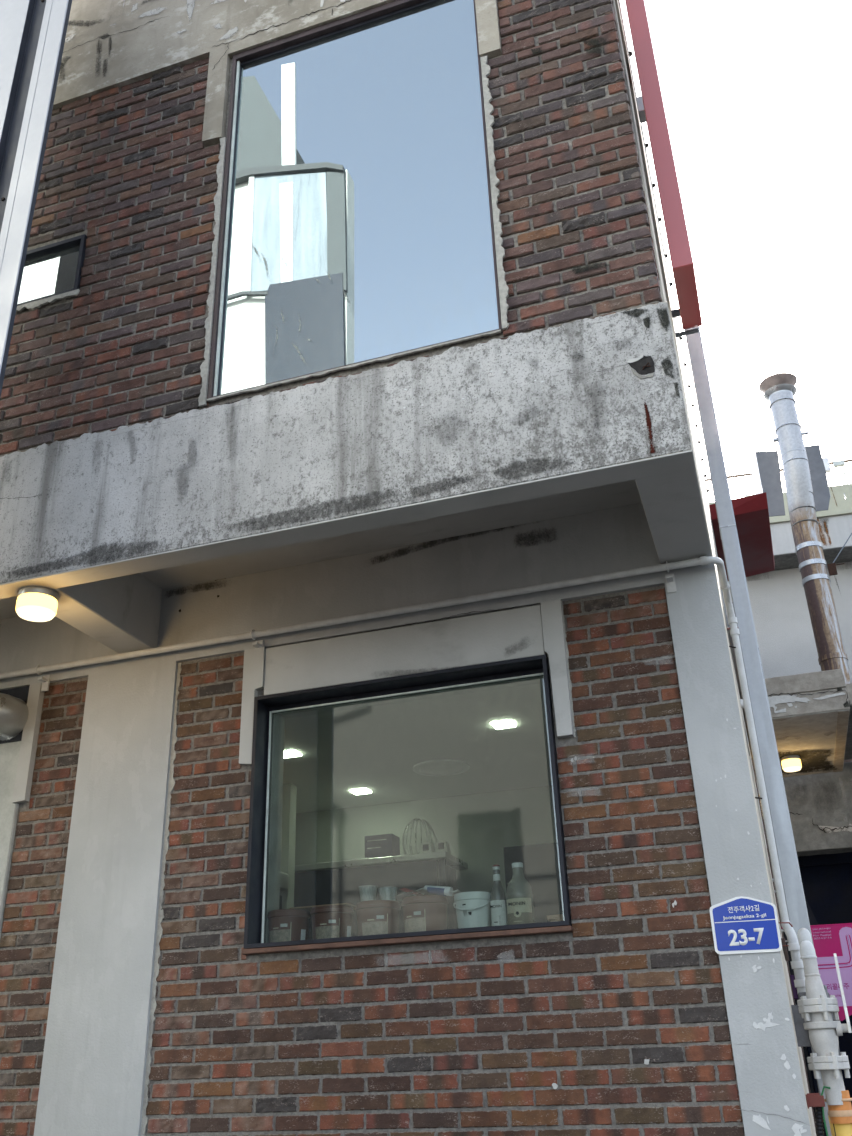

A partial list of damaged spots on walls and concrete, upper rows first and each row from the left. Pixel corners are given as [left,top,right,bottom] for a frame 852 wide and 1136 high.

crack [213,0,351,69]
spalling [627,355,655,379]
corrosion [644,402,656,453]
water stain [494,458,572,478]
water stain [413,477,472,497]
water stain [232,489,399,531]
water stain [6,541,158,576]
water stain [377,526,549,561]
peeling [768,687,851,713]